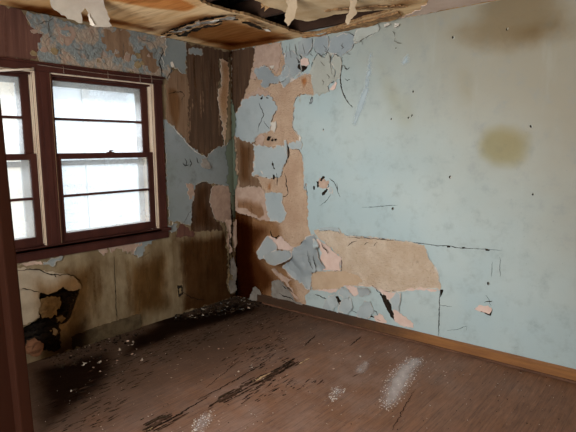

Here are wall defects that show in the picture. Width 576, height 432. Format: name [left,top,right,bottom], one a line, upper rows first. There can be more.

flaking render [159,0,494,328]
crack [18,268,82,285]
crack [414,242,490,251]
flaking render [24,286,90,357]